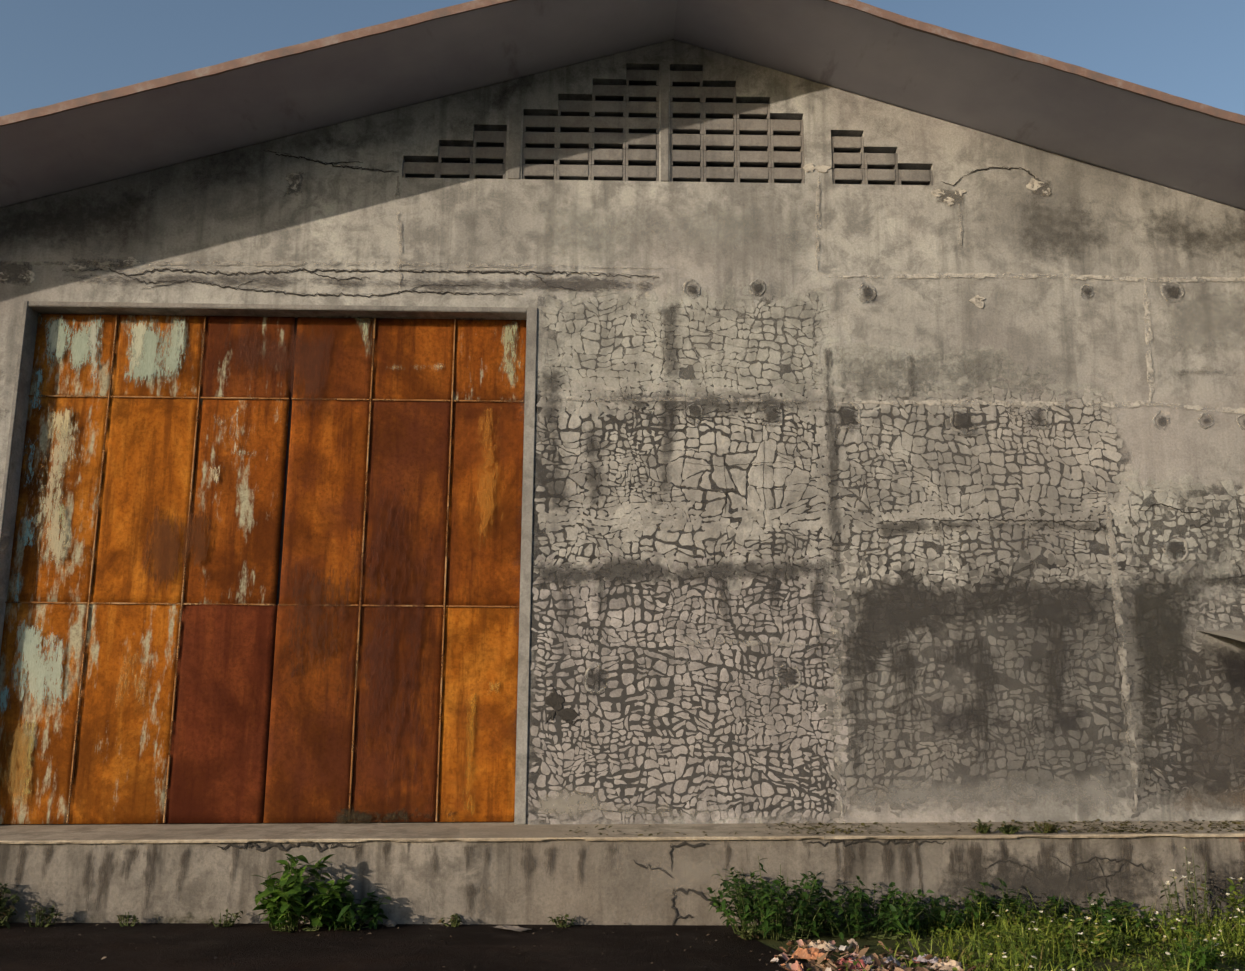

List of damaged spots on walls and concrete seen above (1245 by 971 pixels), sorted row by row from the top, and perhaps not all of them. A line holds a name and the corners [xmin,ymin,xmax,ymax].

crack [62,267,659,298]
peeling [124,318,185,386]
peeling [17,314,104,563]
rust [477,409,498,533]
crack [880,500,1245,581]
damp [841,572,1101,742]
damp [1134,575,1245,706]
peeling [0,619,73,795]
rust [1,722,32,802]
rust [334,809,429,824]
damp [83,847,157,906]
crack [634,841,715,925]